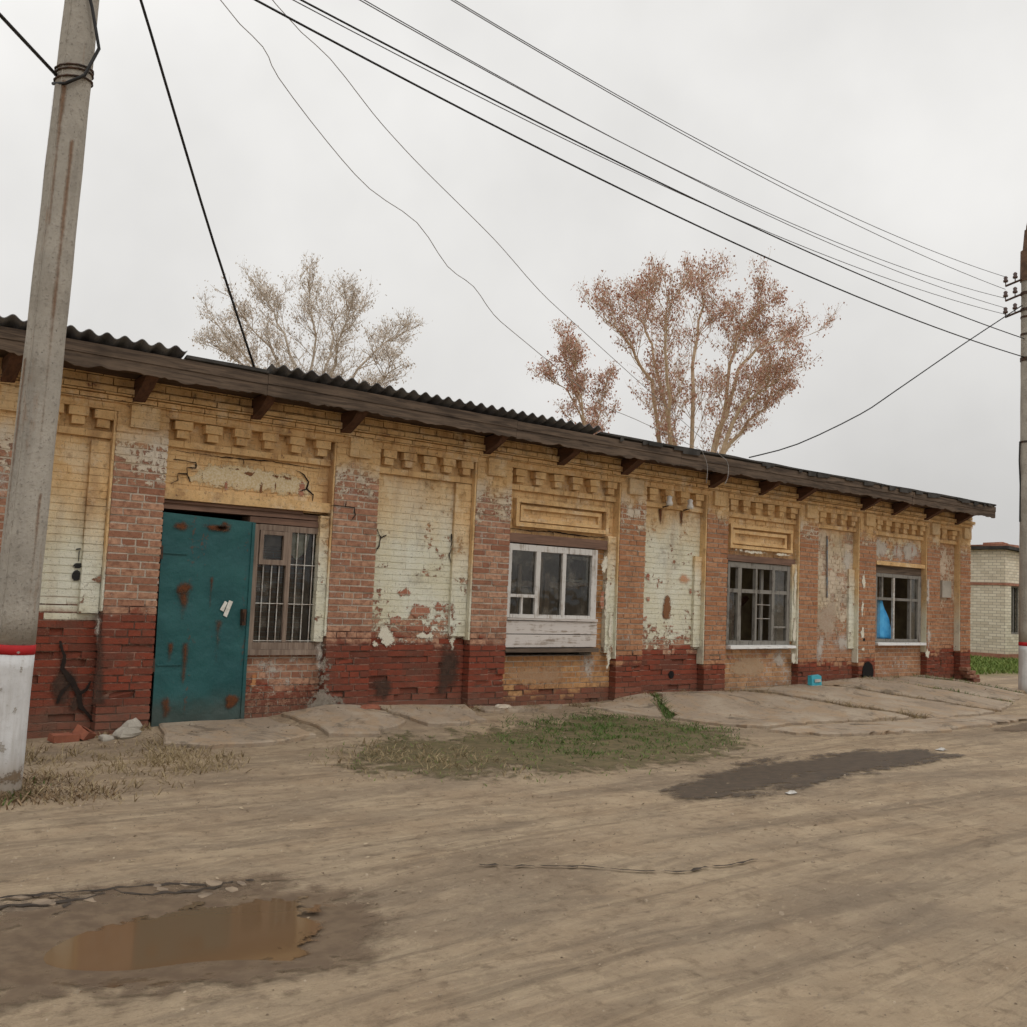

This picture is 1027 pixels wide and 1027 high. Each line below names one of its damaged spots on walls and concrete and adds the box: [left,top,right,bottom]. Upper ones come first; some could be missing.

peeling [190,462,310,497]
crack [171,450,356,519]
rust [207,522,230,531]
peeling [372,587,456,650]
peeling [643,595,688,654]